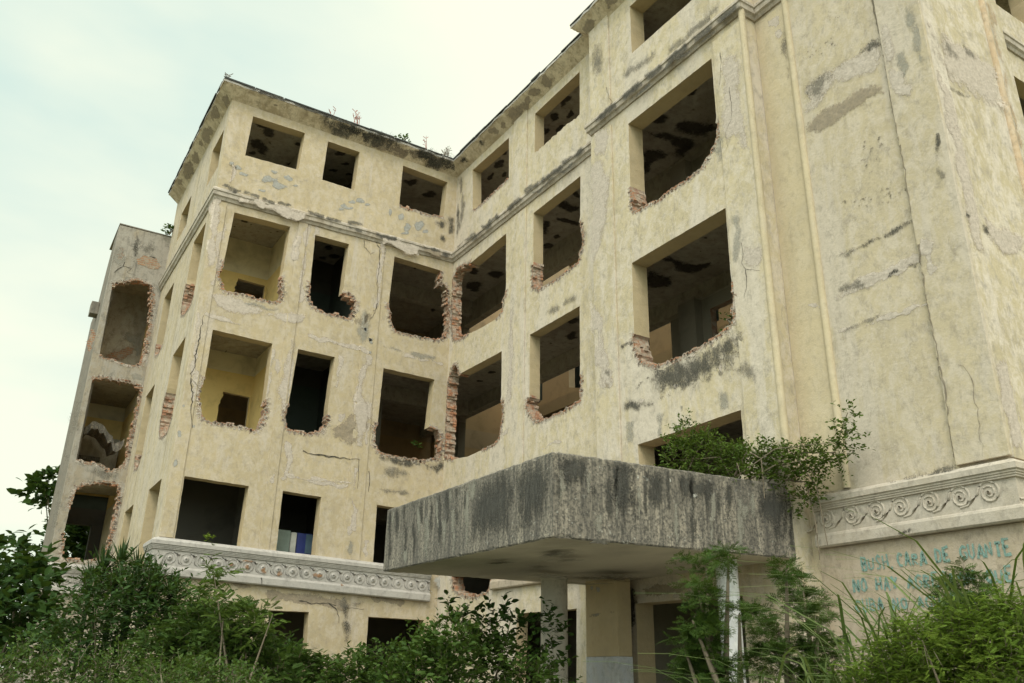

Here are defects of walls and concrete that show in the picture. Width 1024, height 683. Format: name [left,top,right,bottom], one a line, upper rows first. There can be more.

spalling [249,125,274,155]
water stain [251,88,400,149]
peeling [805,24,912,133]
crack [871,0,911,212]
water stain [415,147,584,258]
peeling [837,239,937,300]
crack [190,315,204,428]
peeling [158,161,504,557]
water stain [638,331,751,393]
crack [917,244,983,458]
crack [303,450,370,492]
water stain [381,457,794,563]